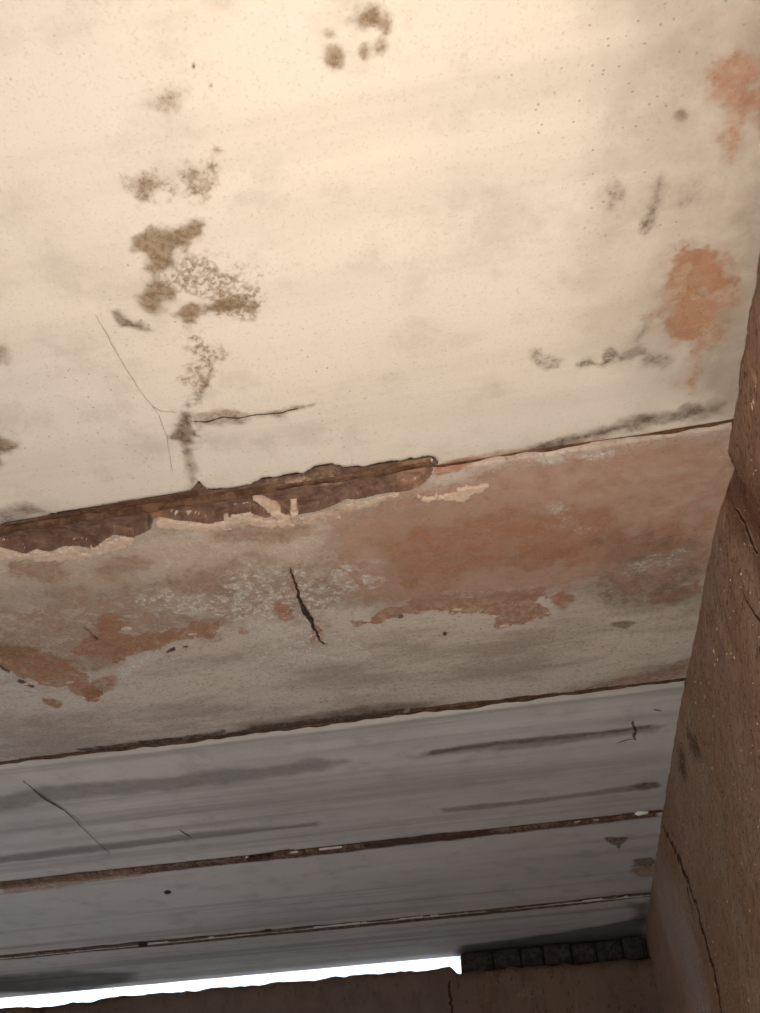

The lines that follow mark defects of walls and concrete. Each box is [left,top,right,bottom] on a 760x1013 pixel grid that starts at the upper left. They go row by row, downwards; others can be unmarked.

water stain [327,51,342,67]
water stain [360,8,388,32]
water stain [135,221,256,323]
corrosion [668,249,739,354]
water stain [172,414,195,451]
spalling [0,456,489,562]
crack [289,567,325,645]
crack [742,588,760,653]
crack [23,781,109,853]
crack [662,820,723,1013]